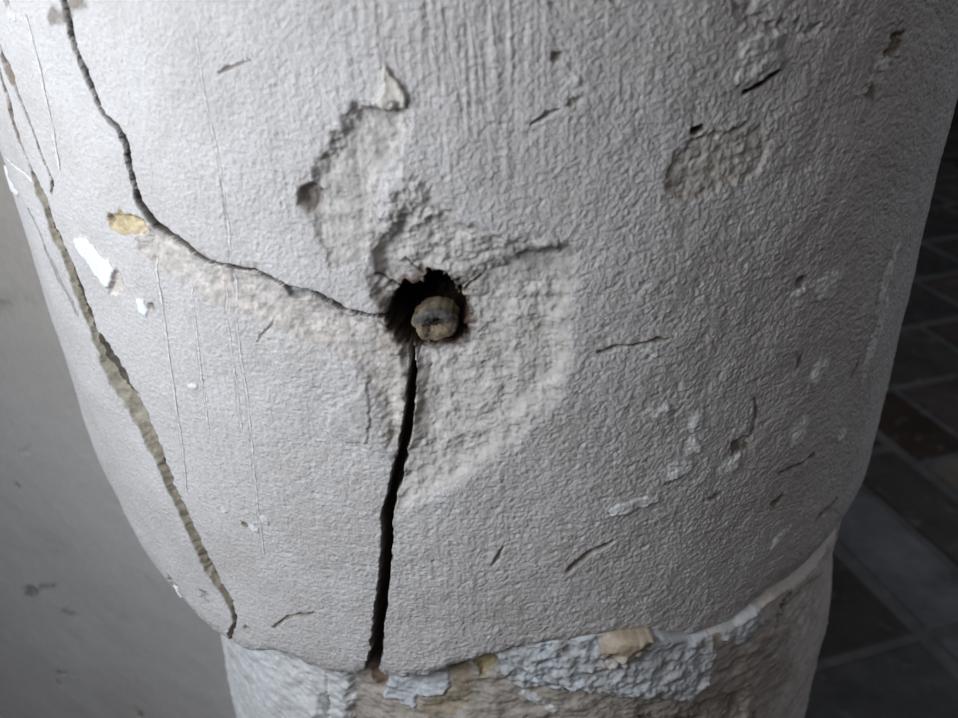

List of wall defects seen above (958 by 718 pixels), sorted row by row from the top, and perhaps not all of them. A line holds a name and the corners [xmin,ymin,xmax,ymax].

crack [62,0,284,284]
peeling [108,268,125,297]
crack [0,51,238,639]
spalling [139,66,572,509]
crack [314,256,424,318]
rust [377,266,475,347]
crack [460,274,482,292]
crack [366,327,424,667]
peeling [715,592,790,645]
spalling [350,656,754,718]